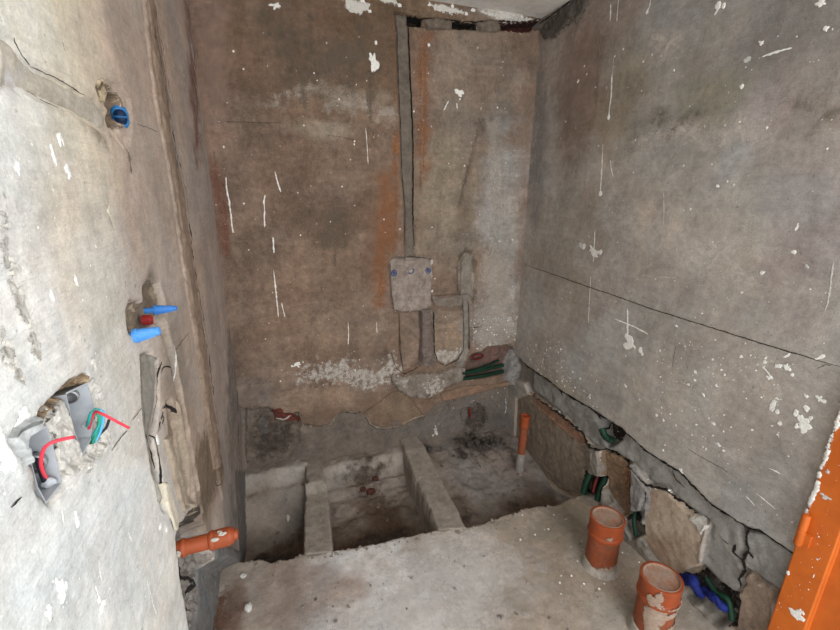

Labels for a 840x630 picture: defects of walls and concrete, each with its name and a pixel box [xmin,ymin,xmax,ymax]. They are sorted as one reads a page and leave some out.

crack [14,39,84,95]
spalling [464,344,514,382]
spalling [246,386,646,537]
crack [526,366,793,589]
spalling [175,506,200,541]
peeling [690,515,710,535]
spalling [693,567,779,630]